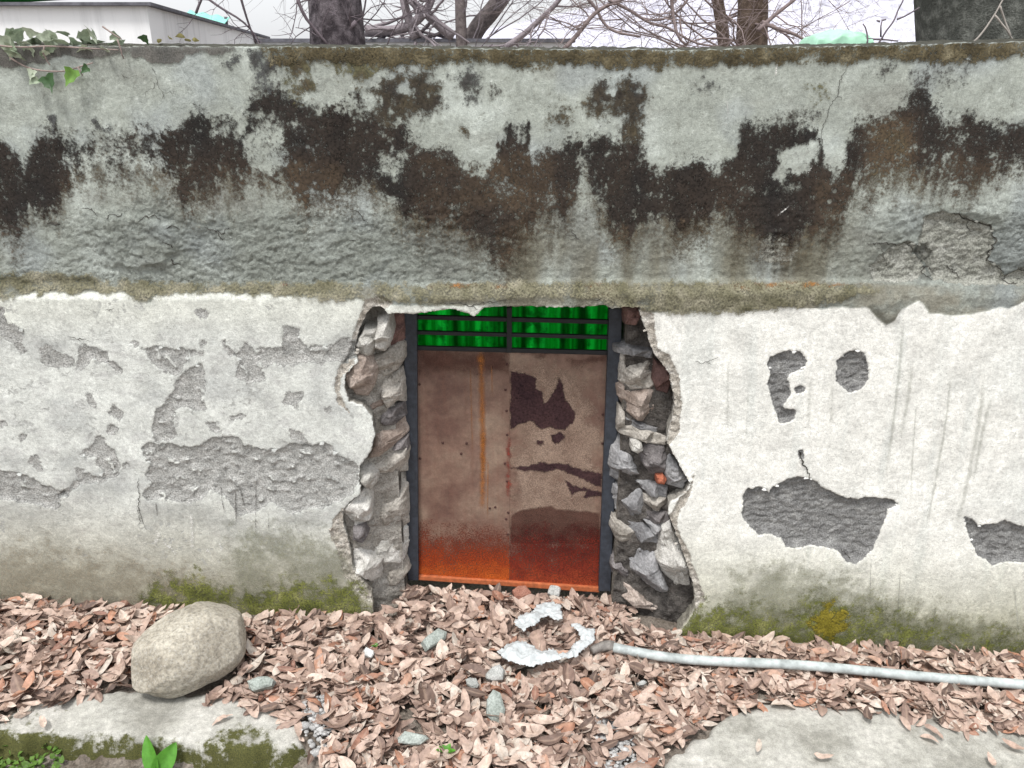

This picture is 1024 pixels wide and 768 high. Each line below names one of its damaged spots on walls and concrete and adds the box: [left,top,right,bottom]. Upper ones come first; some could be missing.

crack [814,72,845,178]
leakage [0,45,1024,291]
crack [868,242,959,280]
crack [953,213,1023,284]
peeling [510,372,576,445]
spalling [767,350,807,423]
spalling [836,350,869,392]
peeling [130,340,372,602]
corrosion [419,520,600,586]
spalling [742,476,898,564]
spalling [964,516,1024,565]
leakage [727,571,1023,652]